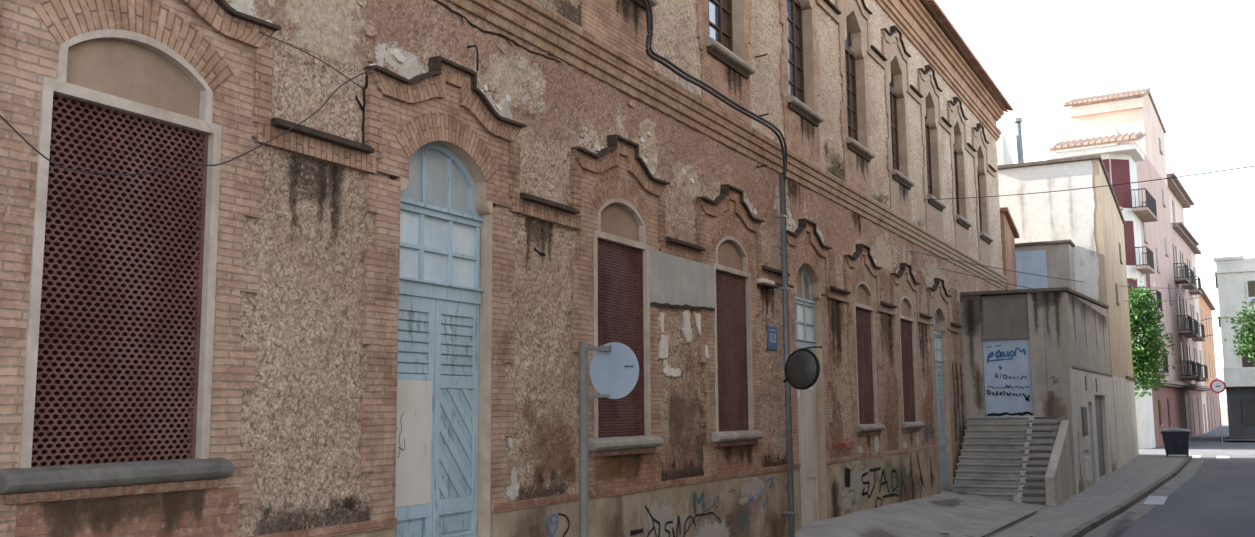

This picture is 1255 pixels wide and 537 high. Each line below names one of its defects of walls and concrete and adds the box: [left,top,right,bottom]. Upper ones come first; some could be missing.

flaking render [225,0,427,79]
water stain [289,155,342,229]
peeling [658,310,709,377]
water stain [45,491,204,537]